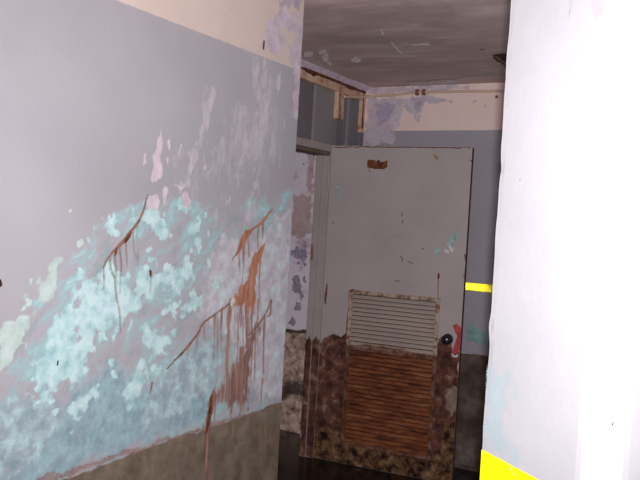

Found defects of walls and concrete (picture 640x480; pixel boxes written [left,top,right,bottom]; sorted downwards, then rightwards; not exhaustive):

peeling [143,131,171,183]
peeling [262,0,352,120]
corrosion [304,67,366,129]
corrosion [367,160,387,173]
peeling [363,76,478,146]
peeling [0,255,63,373]
corrosion [102,195,148,335]
peeling [23,184,309,443]
corrosion [167,209,273,480]
corrosion [299,314,460,480]